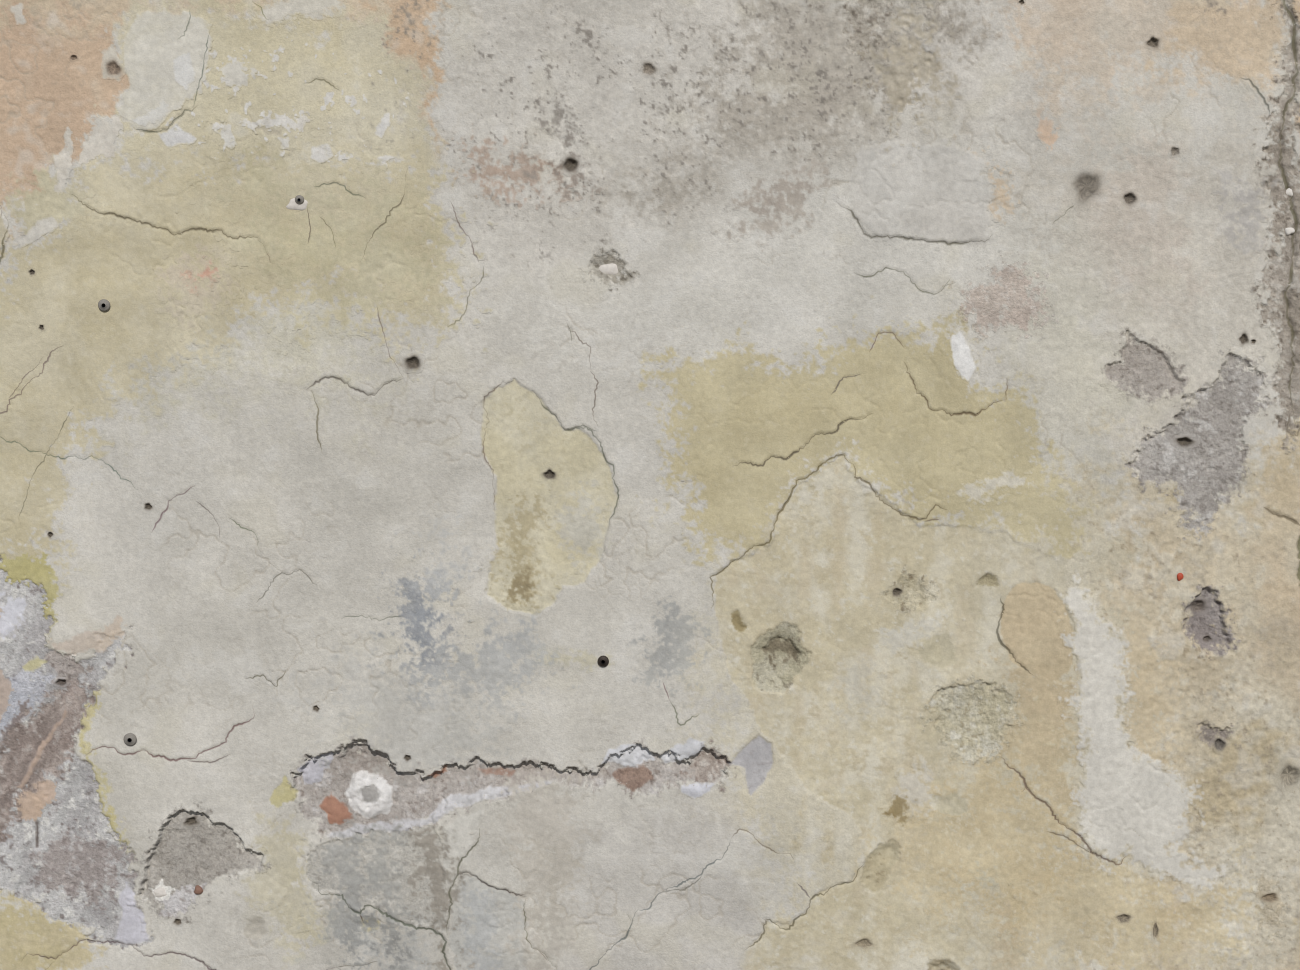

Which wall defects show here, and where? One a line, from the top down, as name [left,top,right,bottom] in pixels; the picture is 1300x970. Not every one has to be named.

flaking render [804,0,942,119]
crack [72,194,271,263]
crack [1241,0,1300,455]
crack [306,308,403,451]
peeling [0,0,494,970]
peeling [480,378,620,614]
crack [709,332,1008,608]
peeling [545,644,617,678]
peeling [634,244,1300,970]
crack [1001,757,1125,866]
crack [310,829,557,970]
crack [589,828,864,970]